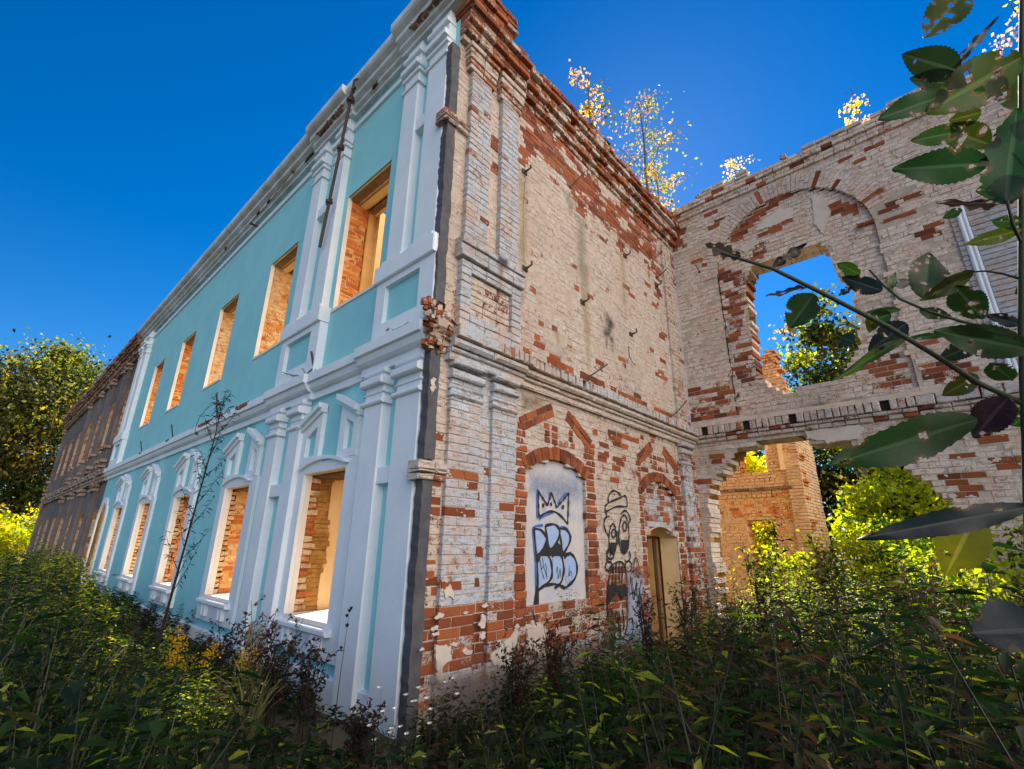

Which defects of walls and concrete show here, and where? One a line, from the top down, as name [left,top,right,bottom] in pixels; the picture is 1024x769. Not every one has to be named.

flaking render [518,105,662,306]
spalling [731,193,794,262]
spalling [829,191,924,228]
spalling [420,296,456,354]
spalling [432,467,489,489]
spalling [709,453,725,464]
spalling [460,509,475,517]
flaking render [419,571,480,651]
flaking render [443,602,491,675]
flaking render [502,620,545,664]